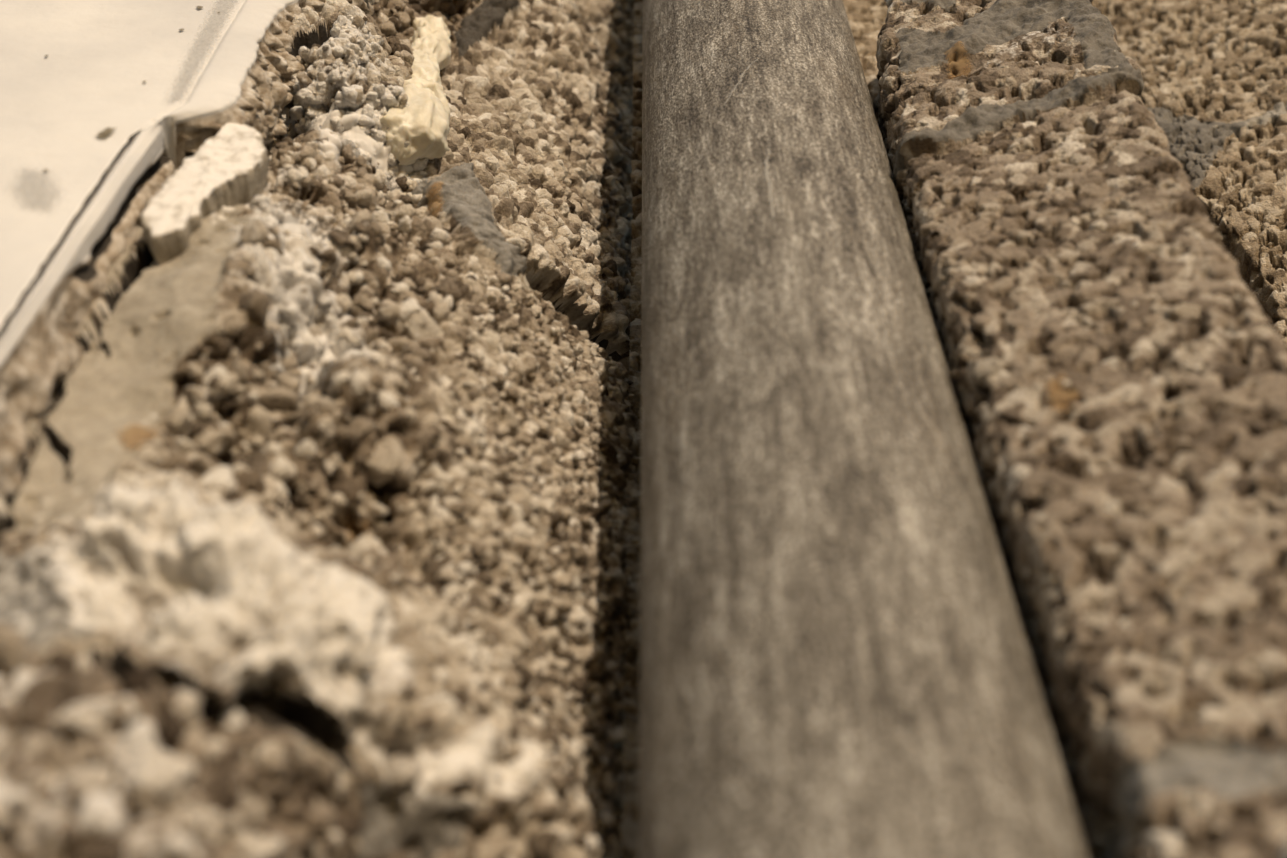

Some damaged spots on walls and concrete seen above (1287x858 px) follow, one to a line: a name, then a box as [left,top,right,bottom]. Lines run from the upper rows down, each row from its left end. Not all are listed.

spalling [372,0,481,79]
peeling [97,127,113,138]
spalling [134,123,464,620]